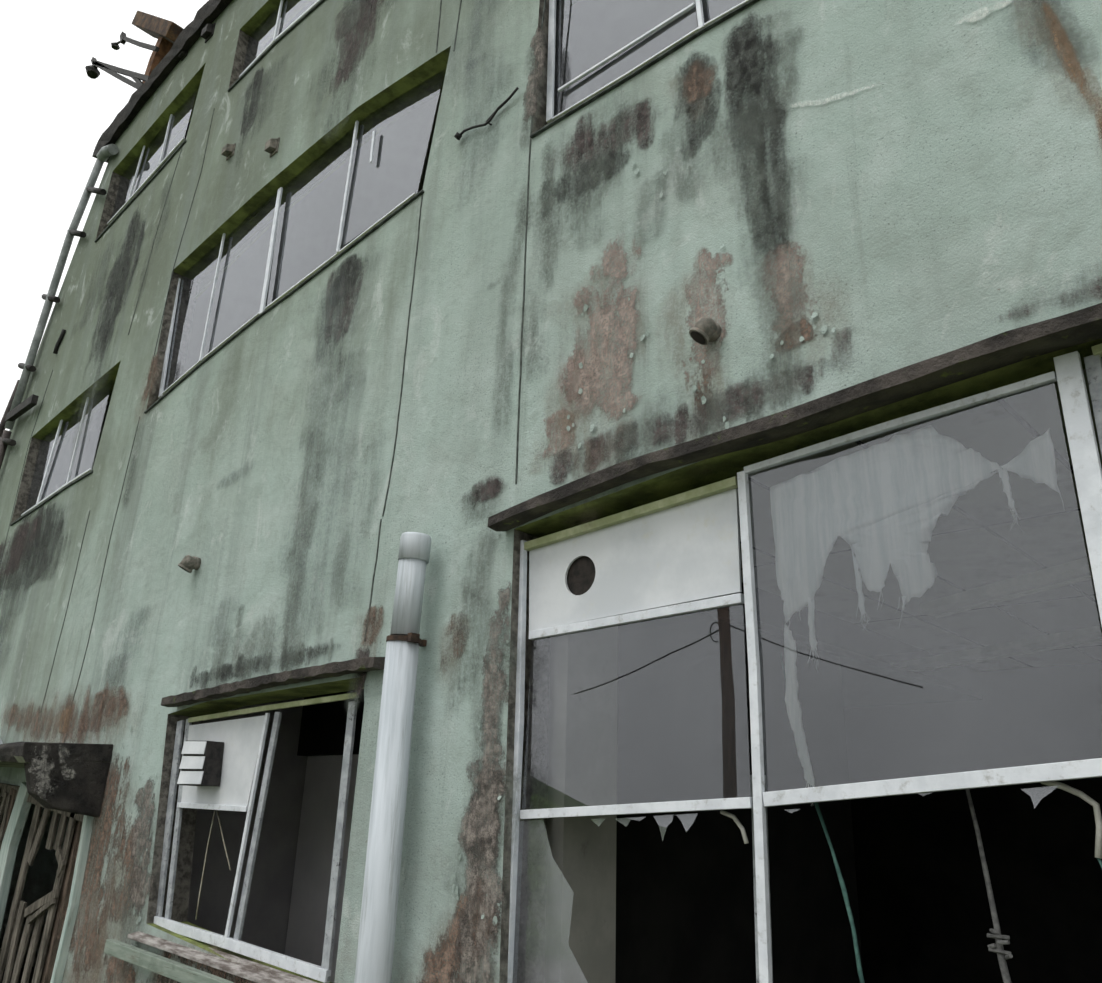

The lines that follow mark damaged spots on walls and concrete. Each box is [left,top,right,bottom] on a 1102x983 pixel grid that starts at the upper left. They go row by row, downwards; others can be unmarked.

water stain [324,0,384,90]
water stain [541,100,653,280]
water stain [678,14,789,251]
water stain [77,214,145,439]
peeling [542,239,649,457]
peeling [683,244,731,429]
peeling [764,242,836,359]
water stain [0,505,63,626]
spalling [28,744,76,800]
peeling [58,757,180,983]
spalling [422,583,512,983]